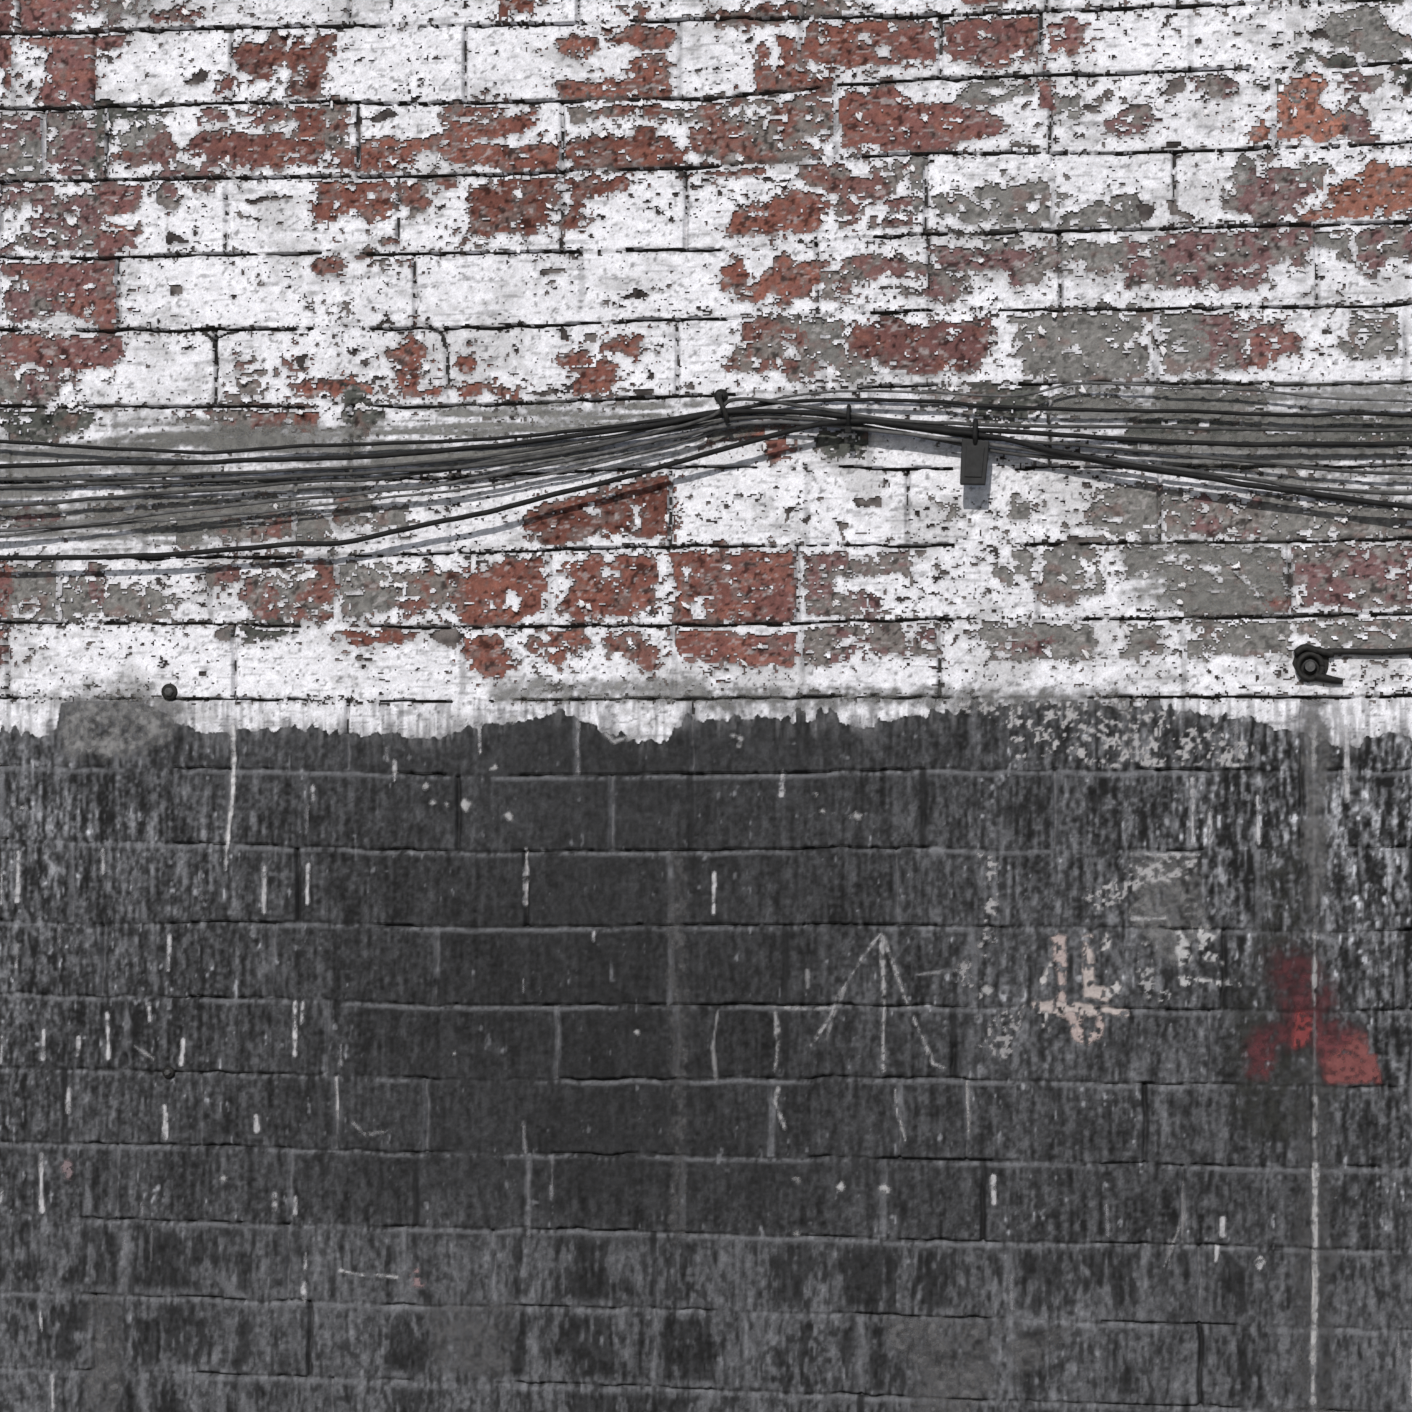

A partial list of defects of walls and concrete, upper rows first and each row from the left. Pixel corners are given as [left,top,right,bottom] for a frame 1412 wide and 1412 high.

damp [1259,846,1316,988]
damp [1230,999,1336,1138]
damp [1310,1163,1319,1403]